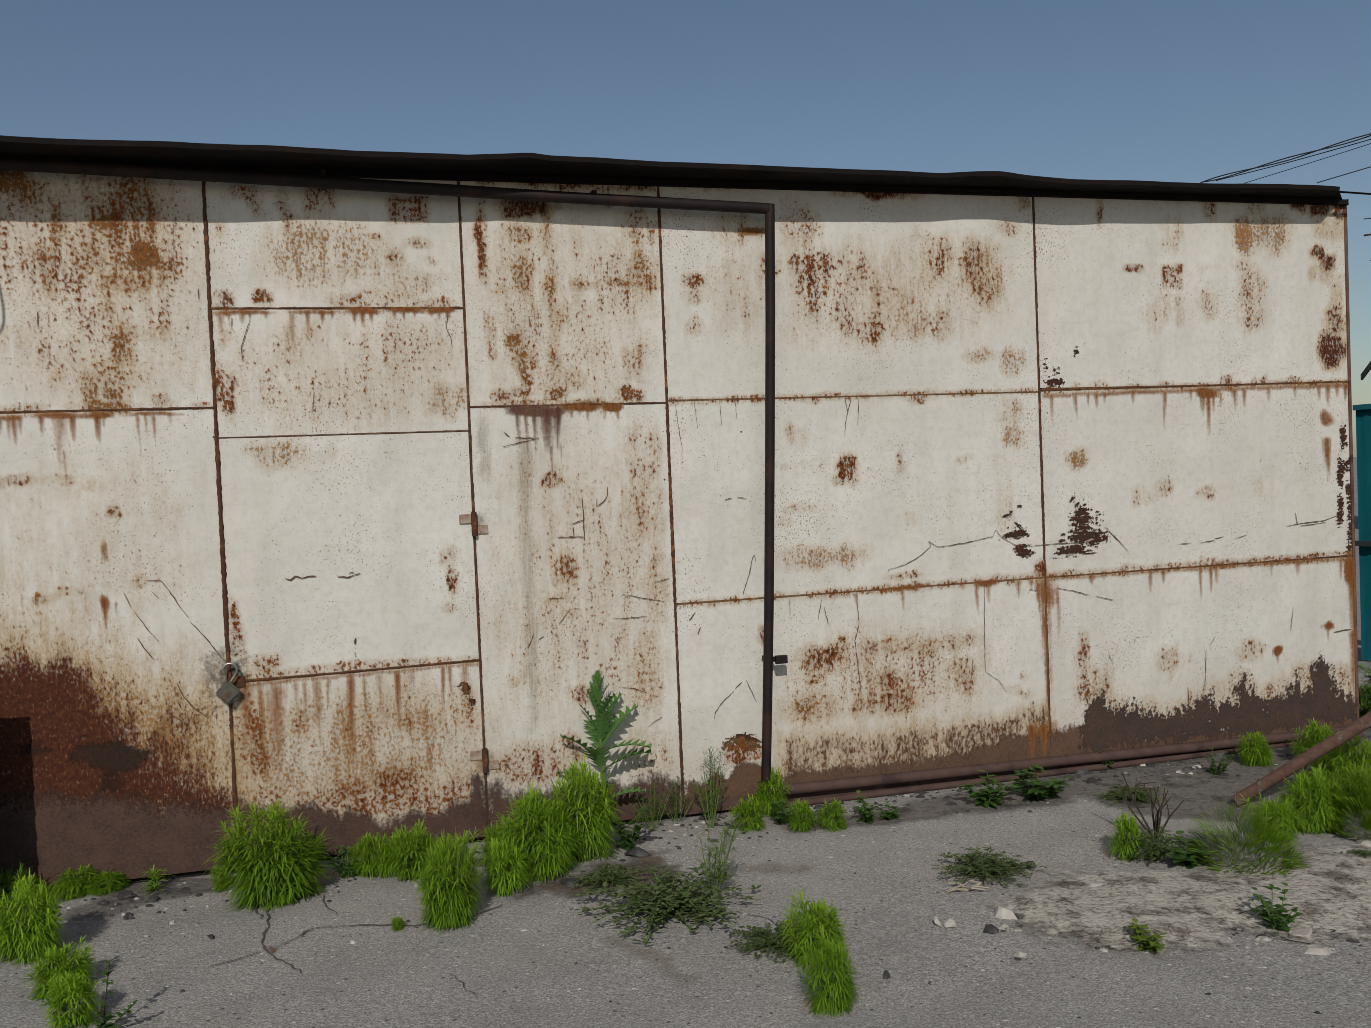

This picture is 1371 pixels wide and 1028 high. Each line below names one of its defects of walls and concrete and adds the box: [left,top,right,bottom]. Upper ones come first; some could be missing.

rust [0,171,1358,894]
peeling [999,505,1036,558]
peeling [1053,495,1111,559]
crack [208,894,436,973]